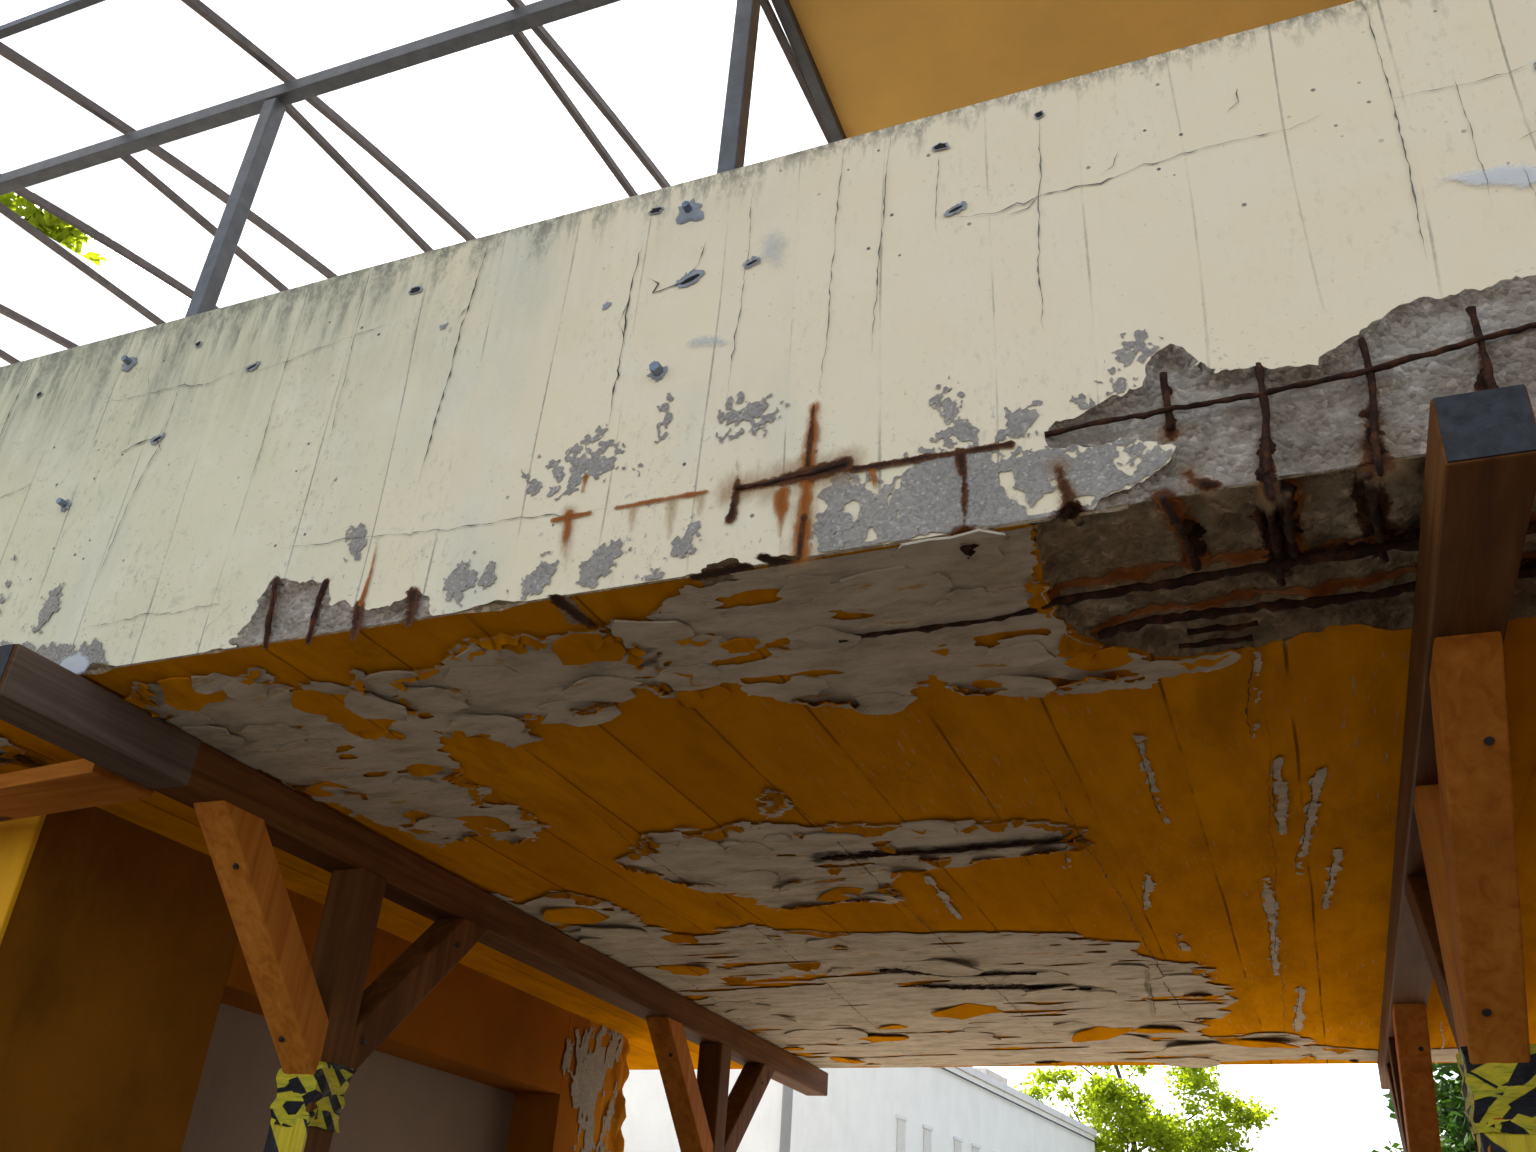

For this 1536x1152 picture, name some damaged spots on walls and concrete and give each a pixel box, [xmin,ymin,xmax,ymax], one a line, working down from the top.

peeling [675,269,705,288]
crack [819,151,844,391]
crack [871,136,891,355]
crack [973,87,1319,326]
corrosion [358,552,376,606]
corrosion [550,510,592,543]
corrosion [614,490,708,509]
peeling [0,275,1536,848]
corrosion [725,402,1016,563]
peeling [491,789,1378,1068]
spalling [562,1020,630,1152]
peeling [1431,1048,1459,1063]